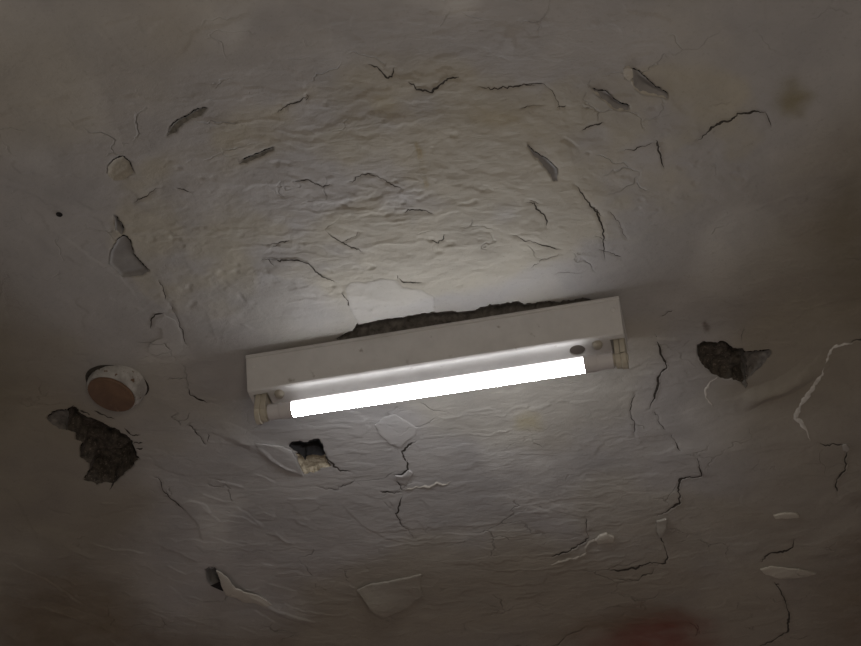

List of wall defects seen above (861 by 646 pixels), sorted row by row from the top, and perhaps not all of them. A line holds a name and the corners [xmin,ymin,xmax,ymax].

crack [368,64,458,93]
spalling [109,215,149,277]
crack [262,241,349,306]
crack [579,189,625,257]
spalling [337,298,590,340]
spalling [697,341,771,388]
spalling [47,405,142,489]
flaking render [254,439,331,476]
crack [380,441,451,533]
crack [629,336,704,516]
crack [794,339,861,491]
flaking render [205,567,272,607]